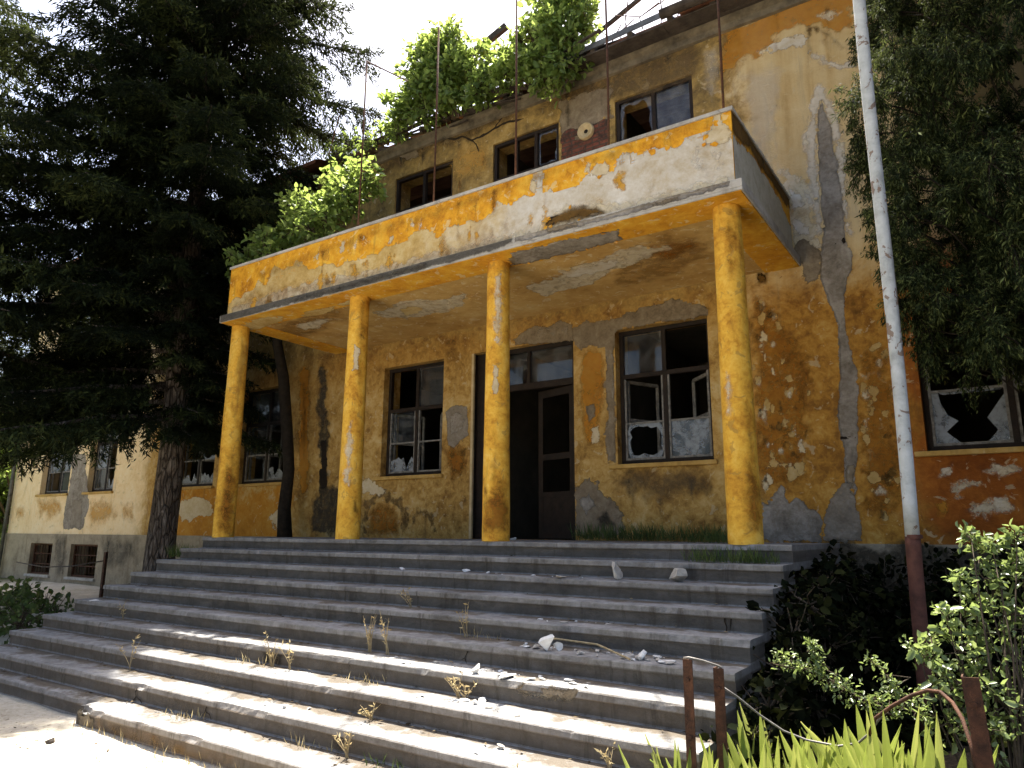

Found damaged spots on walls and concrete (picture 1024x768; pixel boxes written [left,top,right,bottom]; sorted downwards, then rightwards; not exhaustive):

peeling [760,34,854,69]
peeling [227,85,901,543]
water stain [312,366,338,537]
peeling [991,465,1017,475]
peeling [179,497,214,522]
peeling [973,498,1013,512]